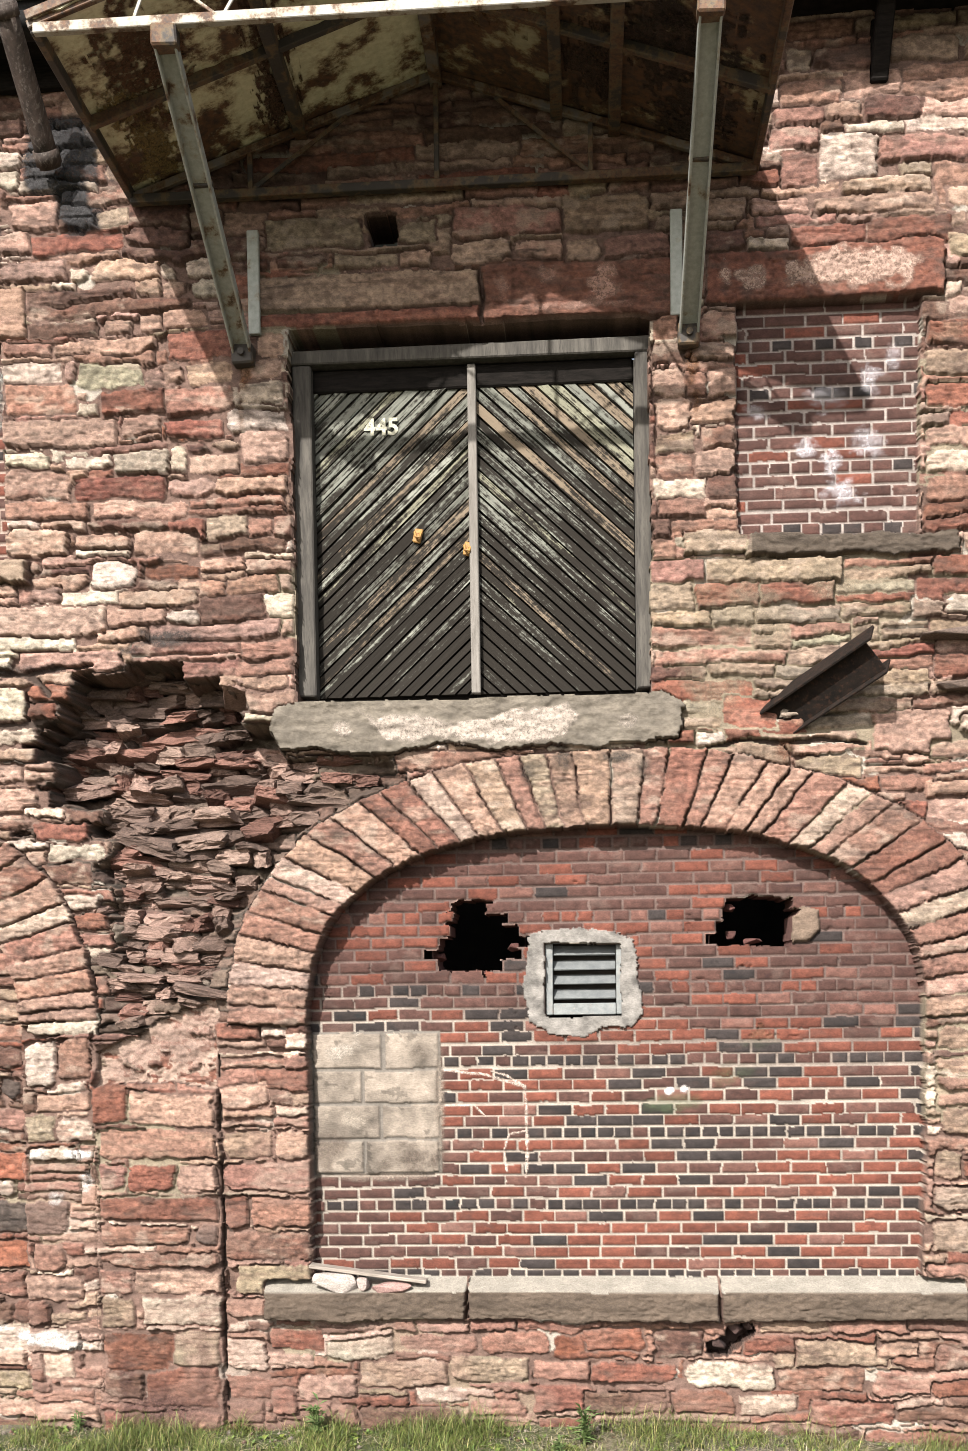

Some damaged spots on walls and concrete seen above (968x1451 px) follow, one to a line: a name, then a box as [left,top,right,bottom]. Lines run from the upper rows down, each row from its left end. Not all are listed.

rust [81,0,184,183]
rust [179,31,197,77]
rust [225,1,303,137]
peeling [369,703,578,743]
peeling [59,691,380,1076]
hole [432,899,528,978]
hole [705,894,801,948]
hole [706,1322,756,1359]